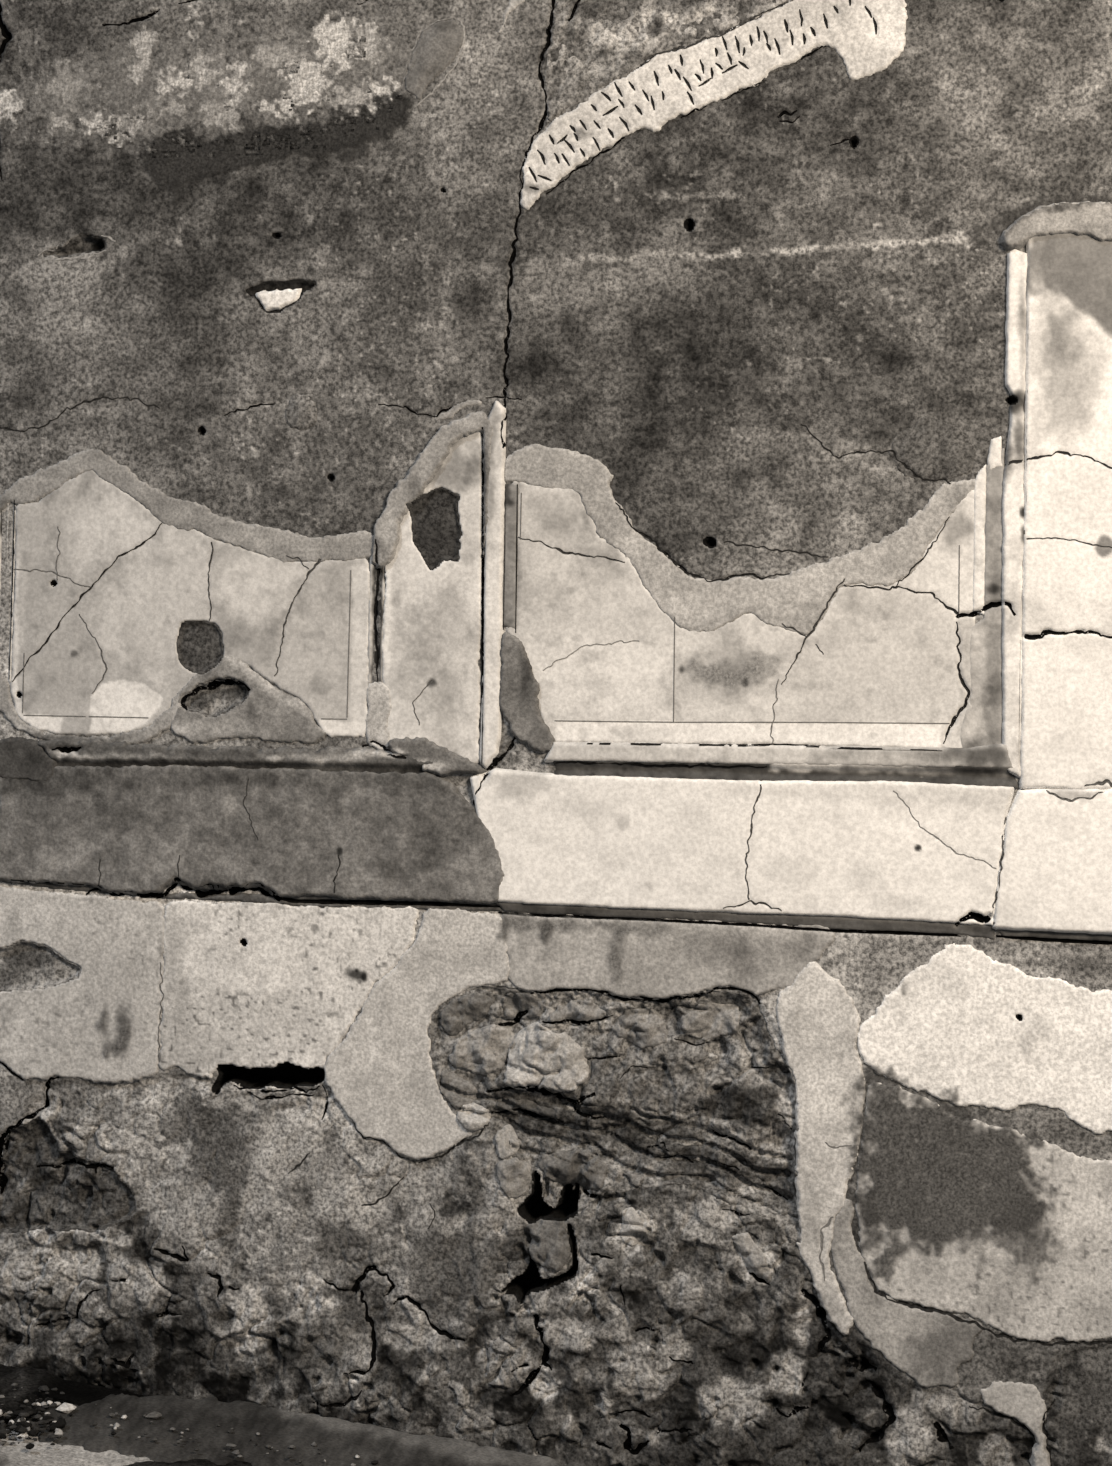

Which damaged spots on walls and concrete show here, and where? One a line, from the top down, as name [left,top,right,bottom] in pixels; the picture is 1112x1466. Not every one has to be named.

water stain [0,2,410,197]
flaking render [255,288,302,311]
crack [486,0,625,449]
crack [12,523,162,694]
crack [181,555,321,710]
spalling [406,487,463,570]
crack [518,424,1112,745]
crack [893,779,1112,926]
spalling [0,940,81,992]
spalling [0,1117,136,1234]
spalling [427,984,801,1272]
water stain [850,1067,1053,1282]